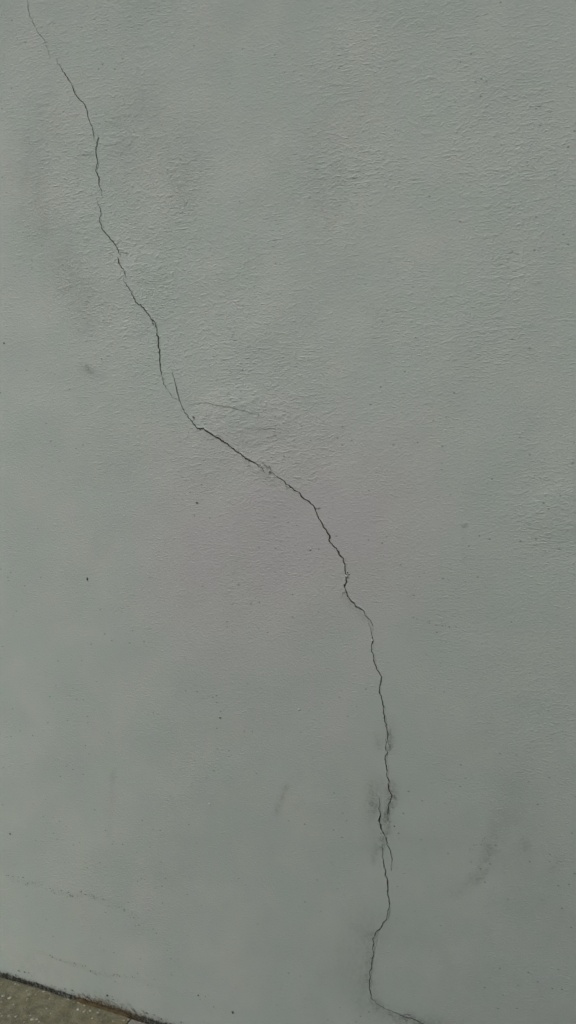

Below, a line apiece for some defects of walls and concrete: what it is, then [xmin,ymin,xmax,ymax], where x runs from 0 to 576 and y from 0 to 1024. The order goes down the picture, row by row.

crack [27,1,423,1024]